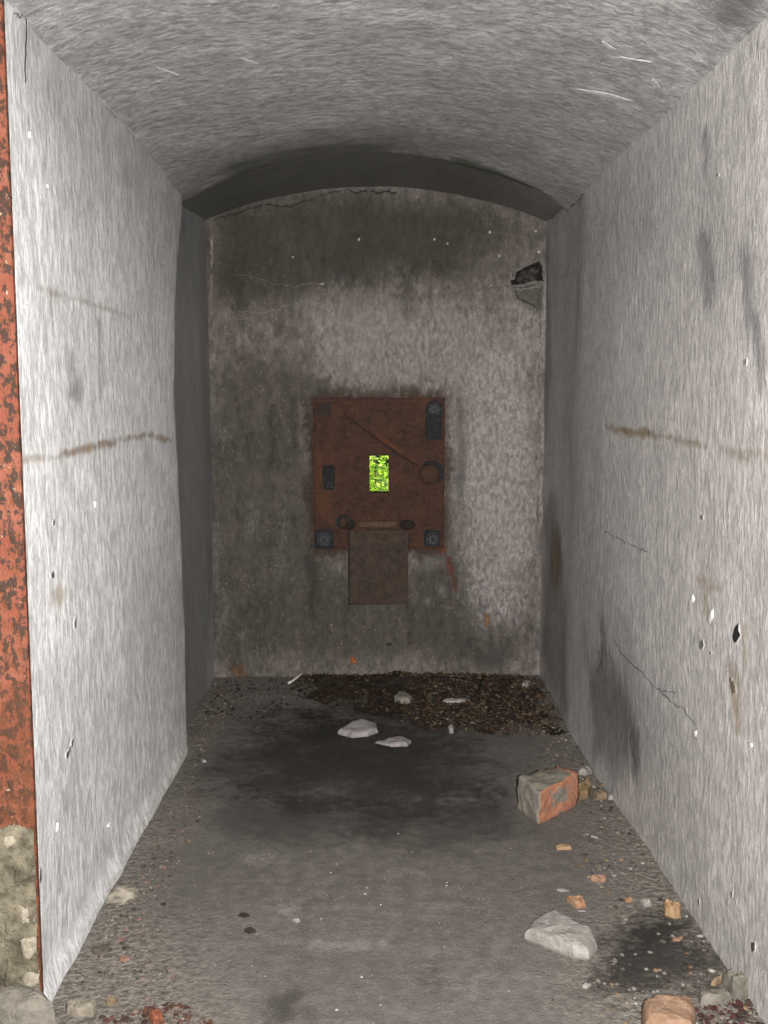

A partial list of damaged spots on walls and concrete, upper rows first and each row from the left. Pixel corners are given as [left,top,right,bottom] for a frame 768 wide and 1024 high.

crack [213,189,397,221]
flaking render [508,251,545,313]
corrosion [305,388,454,575]
peeling [732,622,742,644]
crack [597,639,695,725]